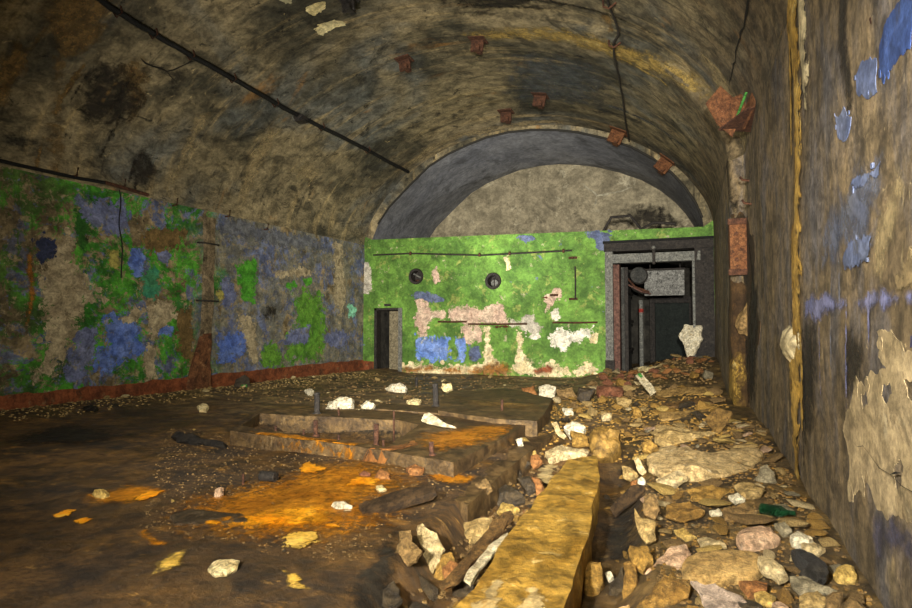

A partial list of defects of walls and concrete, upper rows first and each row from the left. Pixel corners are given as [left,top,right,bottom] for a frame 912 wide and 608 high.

peeling [306,1,346,36]
damp [442,0,628,23]
crack [729,0,751,83]
peeling [854,0,912,99]
damp [71,62,146,158]
peeling [834,107,852,142]
rust [783,0,803,480]
peeling [843,234,871,270]
peeling [402,266,598,377]
peeling [843,329,912,523]